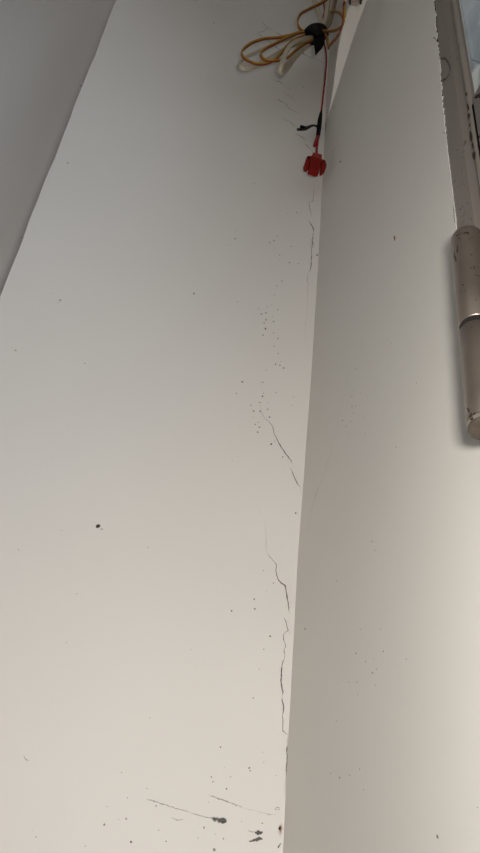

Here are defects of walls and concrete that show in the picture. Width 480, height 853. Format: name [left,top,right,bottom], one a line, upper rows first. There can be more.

crack [266,549,289,772]